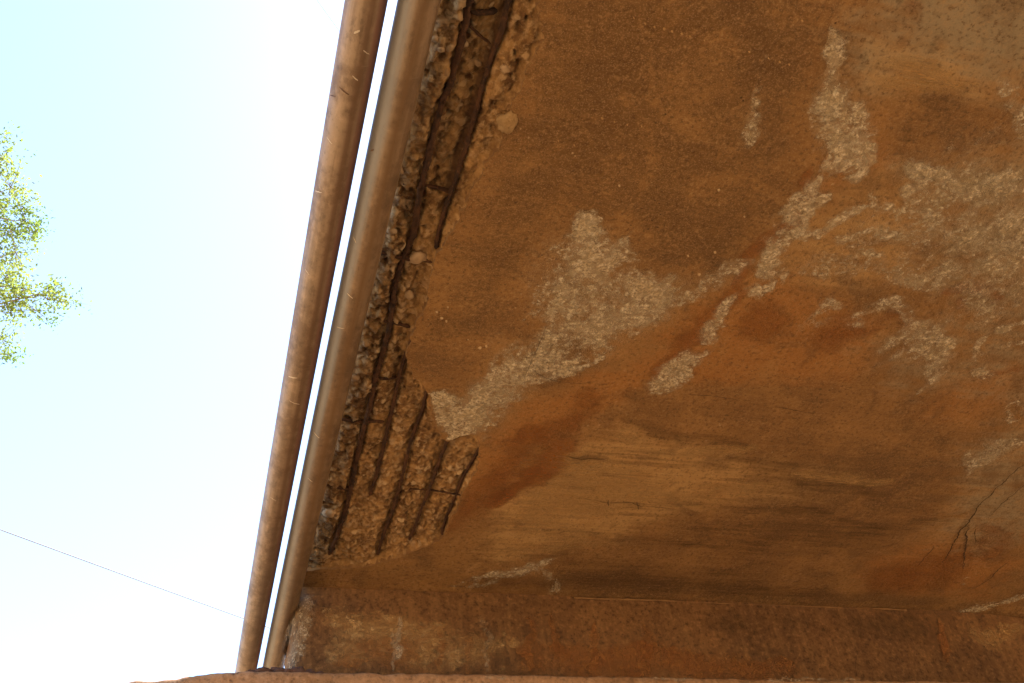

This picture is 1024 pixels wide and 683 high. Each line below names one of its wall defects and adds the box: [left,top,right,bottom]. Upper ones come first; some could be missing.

spalling [308,0,544,568]
water stain [429,30,1024,440]
crack [919,465,1024,587]